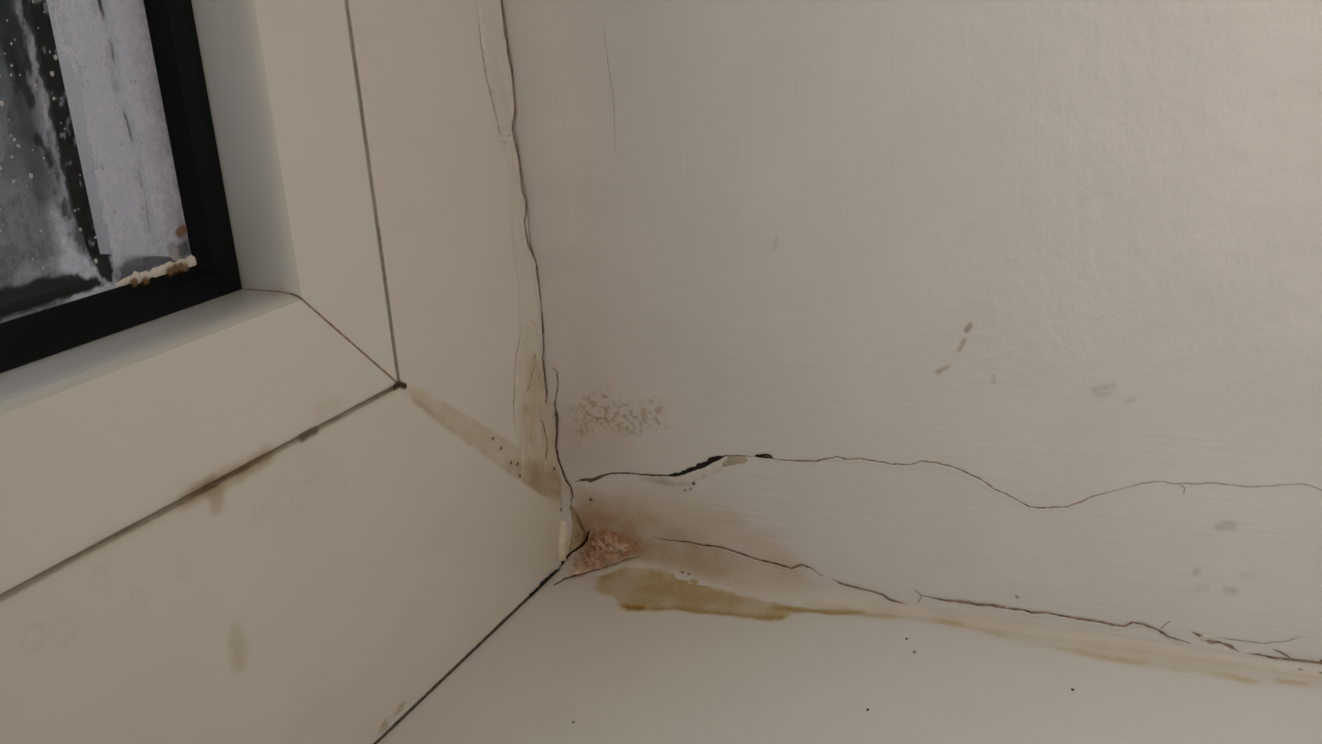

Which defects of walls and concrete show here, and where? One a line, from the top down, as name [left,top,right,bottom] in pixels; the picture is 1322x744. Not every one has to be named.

crack [498,0,1322,514]
crack [652,537,1322,664]